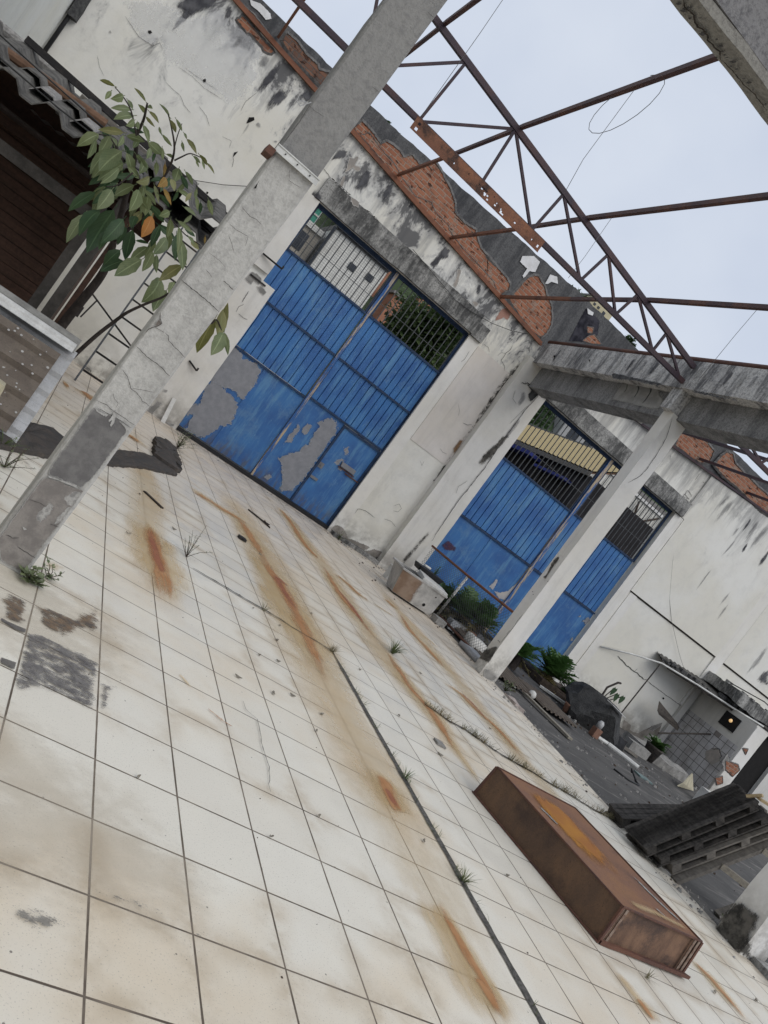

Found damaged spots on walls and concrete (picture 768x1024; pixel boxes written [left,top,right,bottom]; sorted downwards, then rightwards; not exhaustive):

water stain [173,0,216,29]
water stain [258,66,288,109]
spalling [235,0,330,87]
water stain [355,171,371,189]
spalling [353,118,558,339]
peeling [165,347,261,438]
peeling [264,418,338,493]
rust [138,469,178,592]
rust [196,492,321,663]
rust [378,600,551,792]
rust [376,773,403,810]
rust [433,913,498,1008]